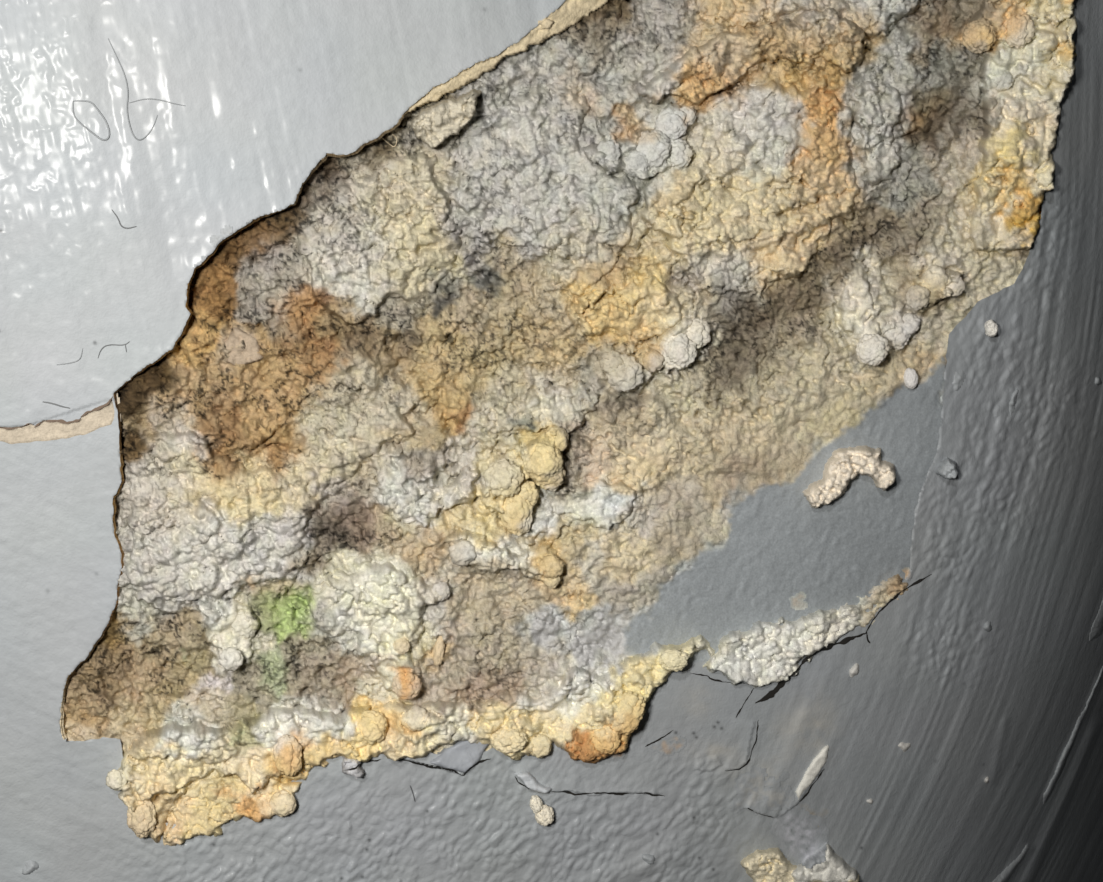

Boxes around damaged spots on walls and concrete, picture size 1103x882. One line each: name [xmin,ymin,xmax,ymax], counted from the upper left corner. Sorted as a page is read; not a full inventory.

damp [962,0,1078,252]
crack [0,393,121,444]
damp [119,0,943,671]
spalling [60,0,1030,754]
damp [835,256,965,366]
damp [106,554,912,846]
peeling [342,756,365,779]
peeling [429,741,491,774]
peeling [514,771,552,794]
crack [515,777,664,796]
peeling [741,745,859,882]